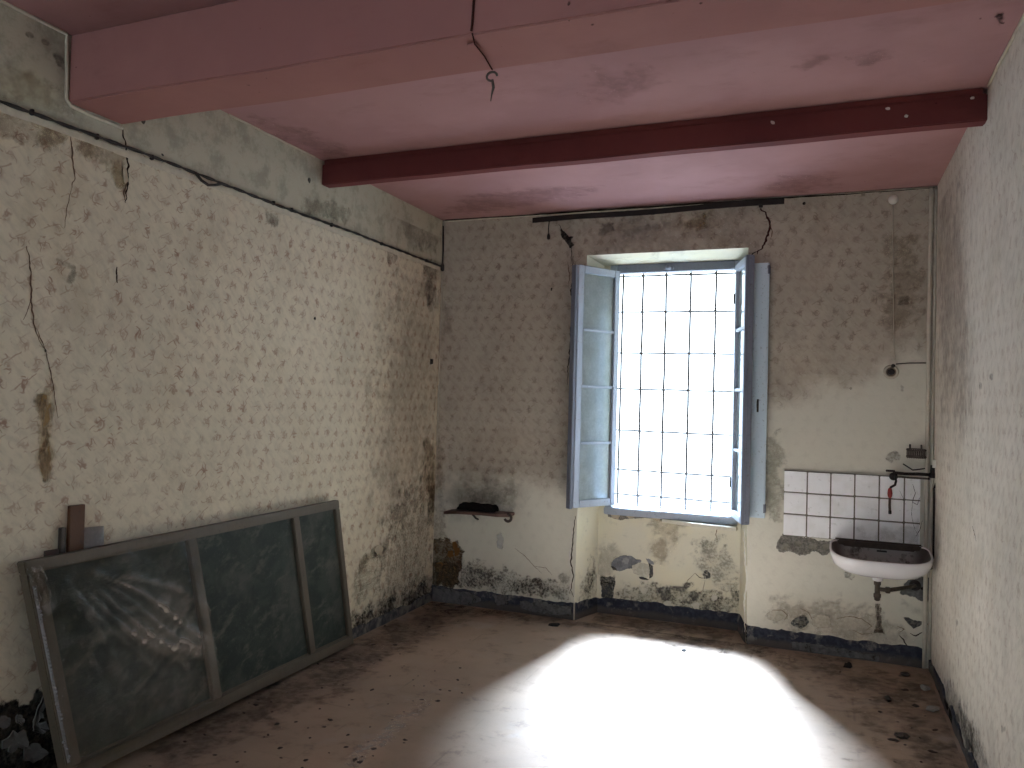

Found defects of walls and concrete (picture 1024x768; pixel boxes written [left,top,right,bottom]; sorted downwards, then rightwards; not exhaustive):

crack [65,136,76,220]
crack [450,187,934,255]
crack [23,246,58,416]
damp [351,577,432,629]
damp [459,559,570,600]
crack [515,512,576,597]
flaking render [611,555,654,580]
damp [600,576,739,613]
flaking render [776,534,830,556]